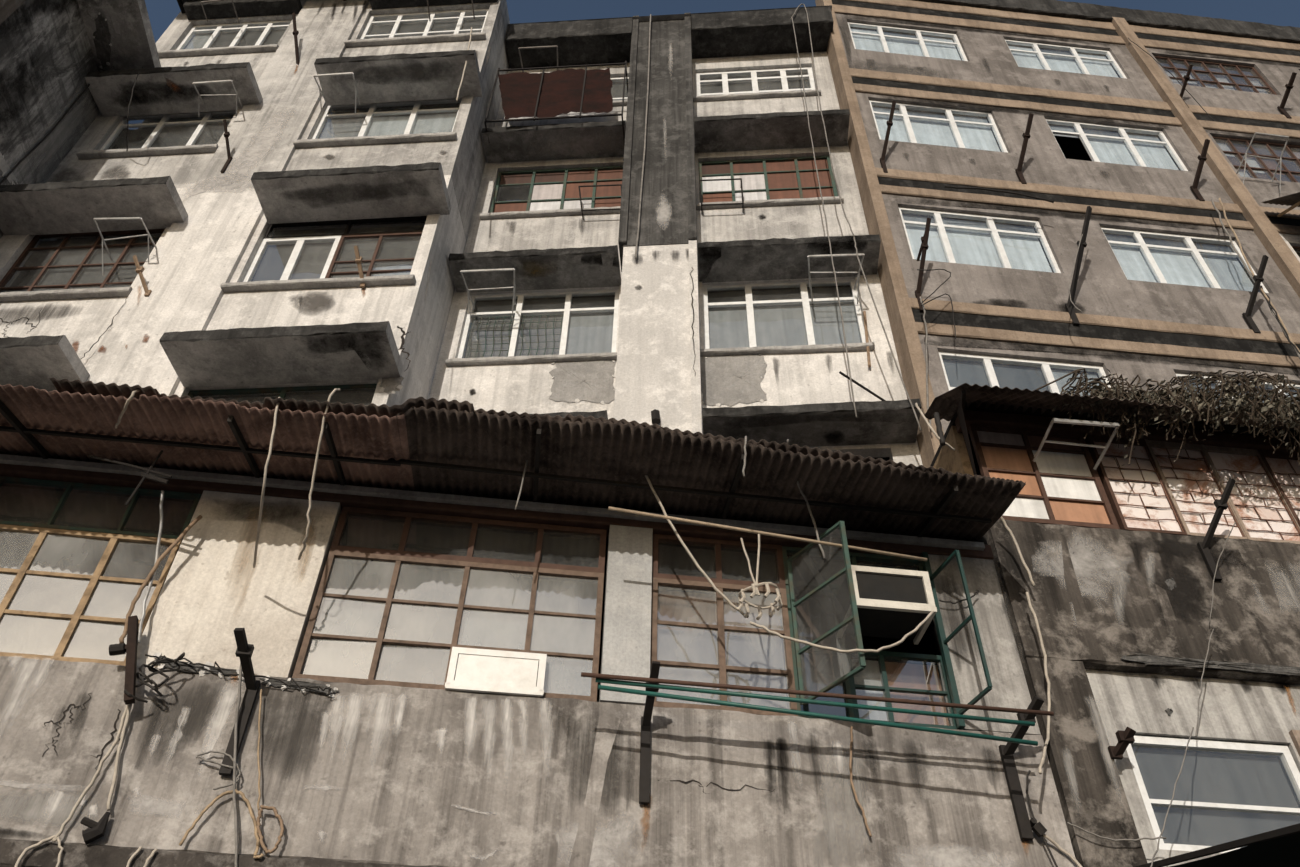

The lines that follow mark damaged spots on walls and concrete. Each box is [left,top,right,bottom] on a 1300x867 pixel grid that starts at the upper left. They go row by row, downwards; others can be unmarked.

damp [0,306,68,325]
damp [1132,539,1244,621]
damp [0,781,95,836]
crack [42,693,121,770]
damp [145,677,239,766]
damp [260,695,361,771]
damp [374,694,405,742]
damp [466,697,526,765]
damp [571,729,630,804]
damp [589,818,631,867]
crack [658,780,775,794]
damp [767,725,876,861]